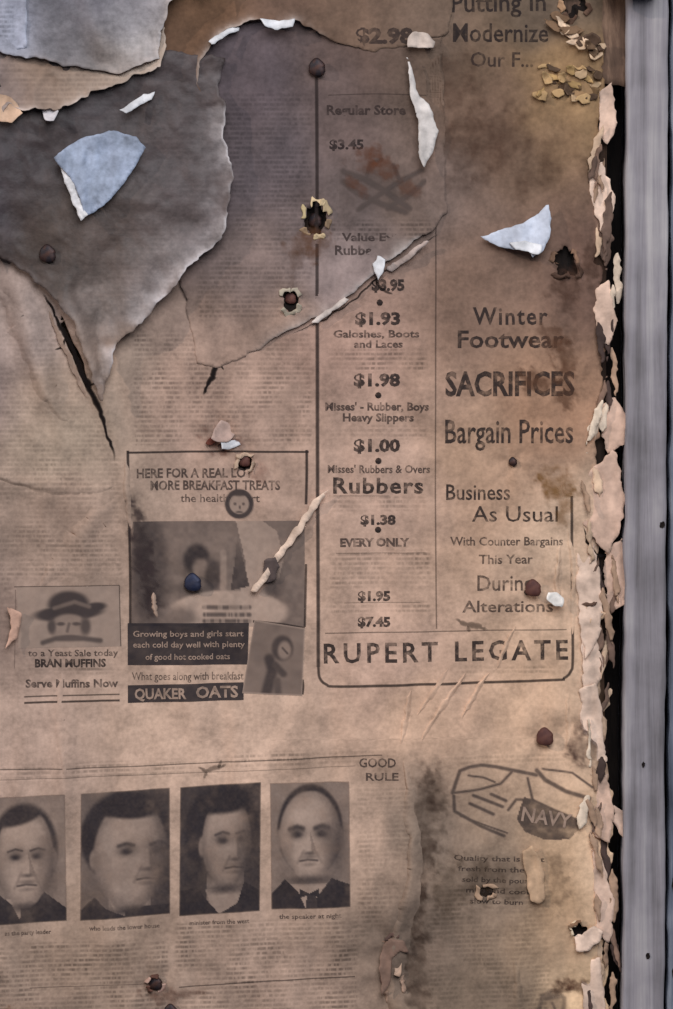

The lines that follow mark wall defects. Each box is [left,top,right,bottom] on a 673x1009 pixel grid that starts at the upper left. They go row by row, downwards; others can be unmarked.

peeling [557,0,593,24]
peeling [279,288,302,317]
crack [302,269,391,330]
crack [46,298,114,452]